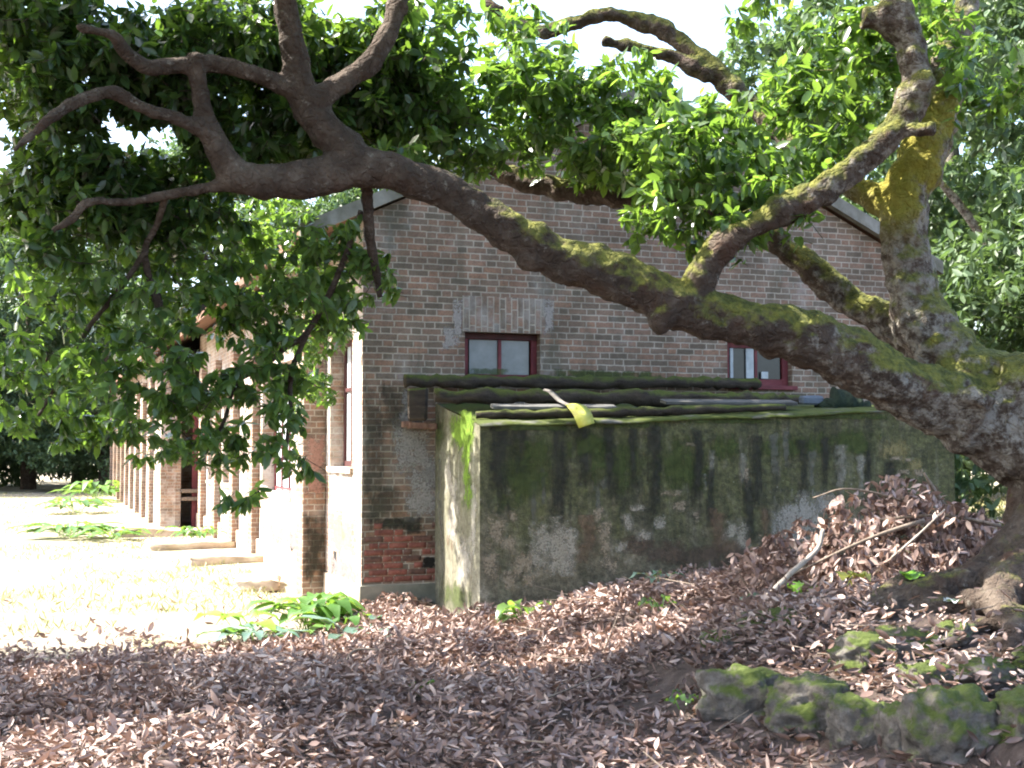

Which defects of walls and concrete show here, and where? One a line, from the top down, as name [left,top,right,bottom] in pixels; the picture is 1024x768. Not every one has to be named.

leakage [489,426,527,512]
leakage [530,422,618,529]
leakage [628,426,662,513]
leakage [693,430,714,521]